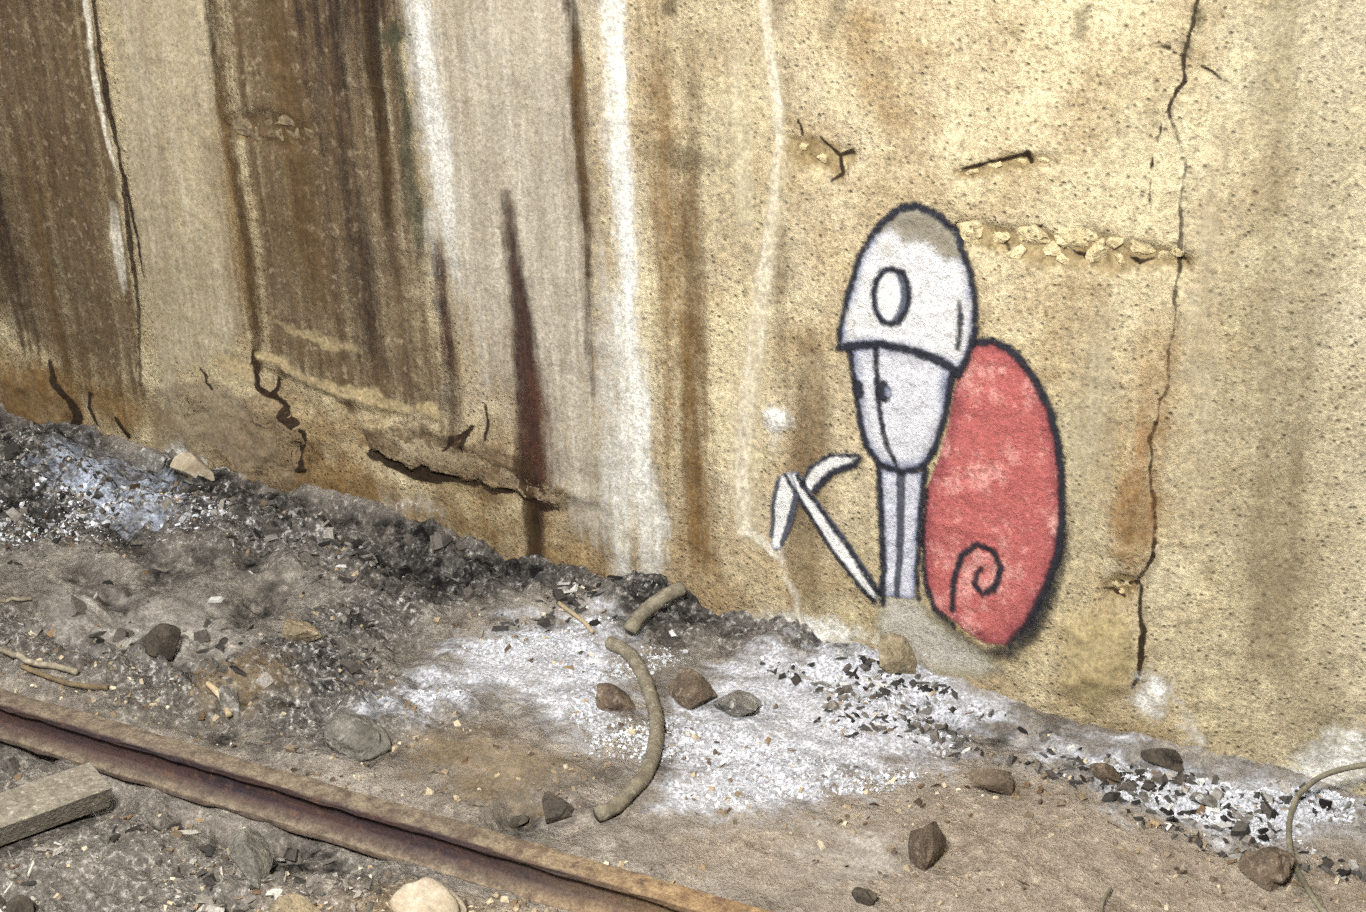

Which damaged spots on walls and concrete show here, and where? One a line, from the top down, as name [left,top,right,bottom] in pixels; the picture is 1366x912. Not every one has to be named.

water stain [0,0,145,398]
water stain [205,0,455,415]
rust [564,0,591,320]
spalling [788,137,856,183]
spalling [954,157,1050,177]
spalling [955,220,1194,272]
crack [48,360,130,439]
crack [250,350,307,473]
peeling [287,327,348,350]
peeling [155,352,576,512]
rust [505,196,547,556]
crack [1120,0,1227,688]